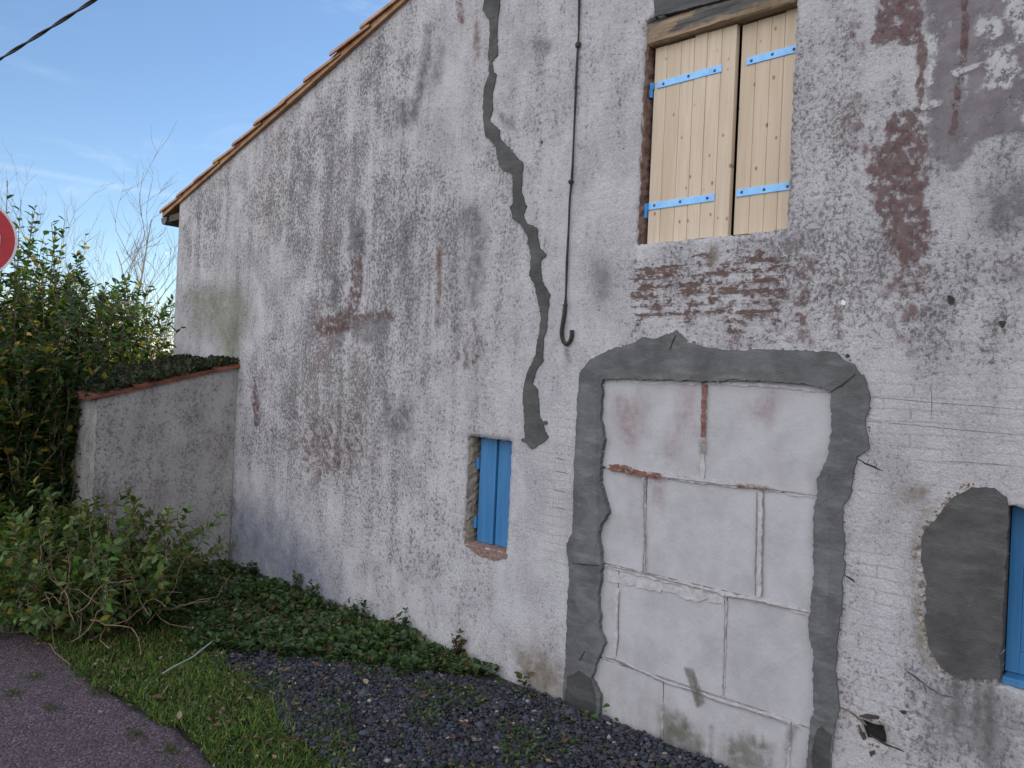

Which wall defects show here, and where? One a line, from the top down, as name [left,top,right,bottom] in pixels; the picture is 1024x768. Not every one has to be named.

crack [482,0,568,509]
peeling [626,238,816,350]
peeling [848,0,1024,342]
spalling [840,707,890,757]